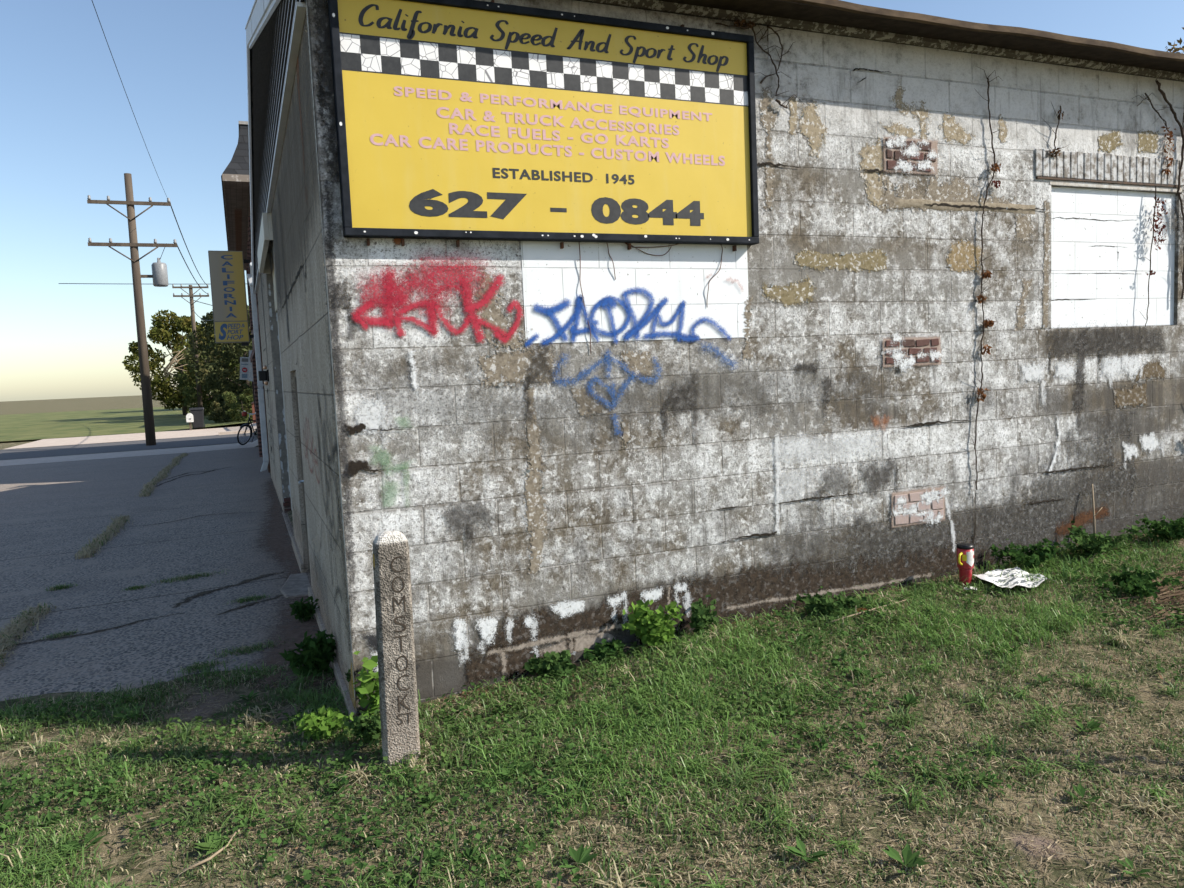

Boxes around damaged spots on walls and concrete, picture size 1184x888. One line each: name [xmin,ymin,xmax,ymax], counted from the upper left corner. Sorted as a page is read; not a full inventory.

peeling [857,86,1051,332]
flaking render [882,331,943,372]
leakage [442,501,498,538]
leakage [458,325,1165,689]
flaking render [891,486,948,527]
leakage [361,633,377,651]